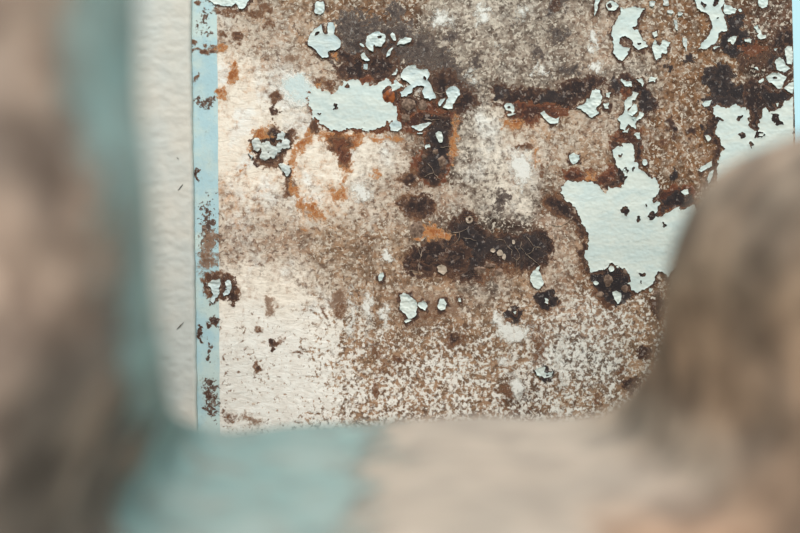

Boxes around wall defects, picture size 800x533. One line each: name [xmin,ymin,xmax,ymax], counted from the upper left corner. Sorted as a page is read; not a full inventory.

peeling [305,29,465,151]
leakage [433,10,461,64]
leakage [465,53,484,84]
leakage [474,2,492,27]
leakage [588,30,599,53]
peeling [694,0,794,181]
rust [239,4,662,329]
peeling [560,76,691,304]
rust [197,192,241,307]
peeling [60,0,398,533]
rust [197,315,220,363]
rust [201,378,261,425]